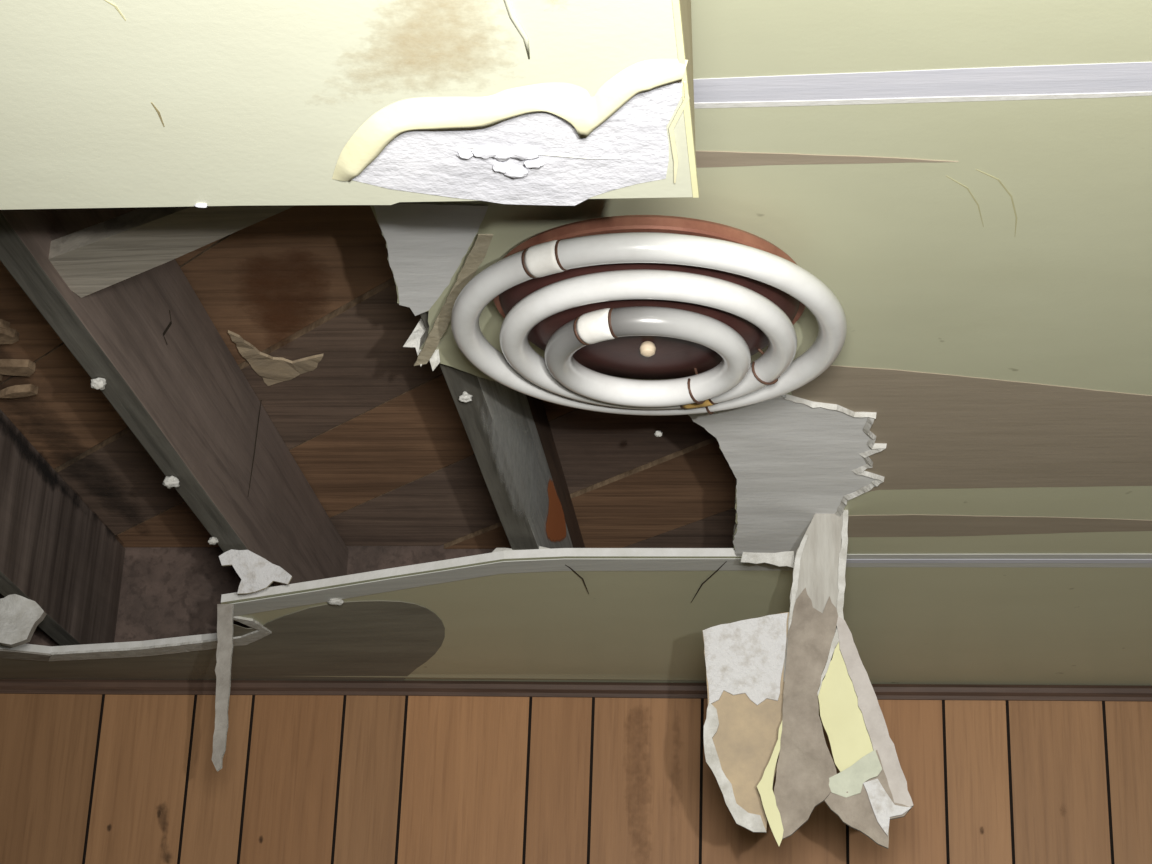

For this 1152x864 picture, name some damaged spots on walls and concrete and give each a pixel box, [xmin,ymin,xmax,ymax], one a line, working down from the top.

spalling [332,59,690,371]
corrosion [546,480,566,542]
peeling [688,365,1152,558]
peeling [0,649,51,661]